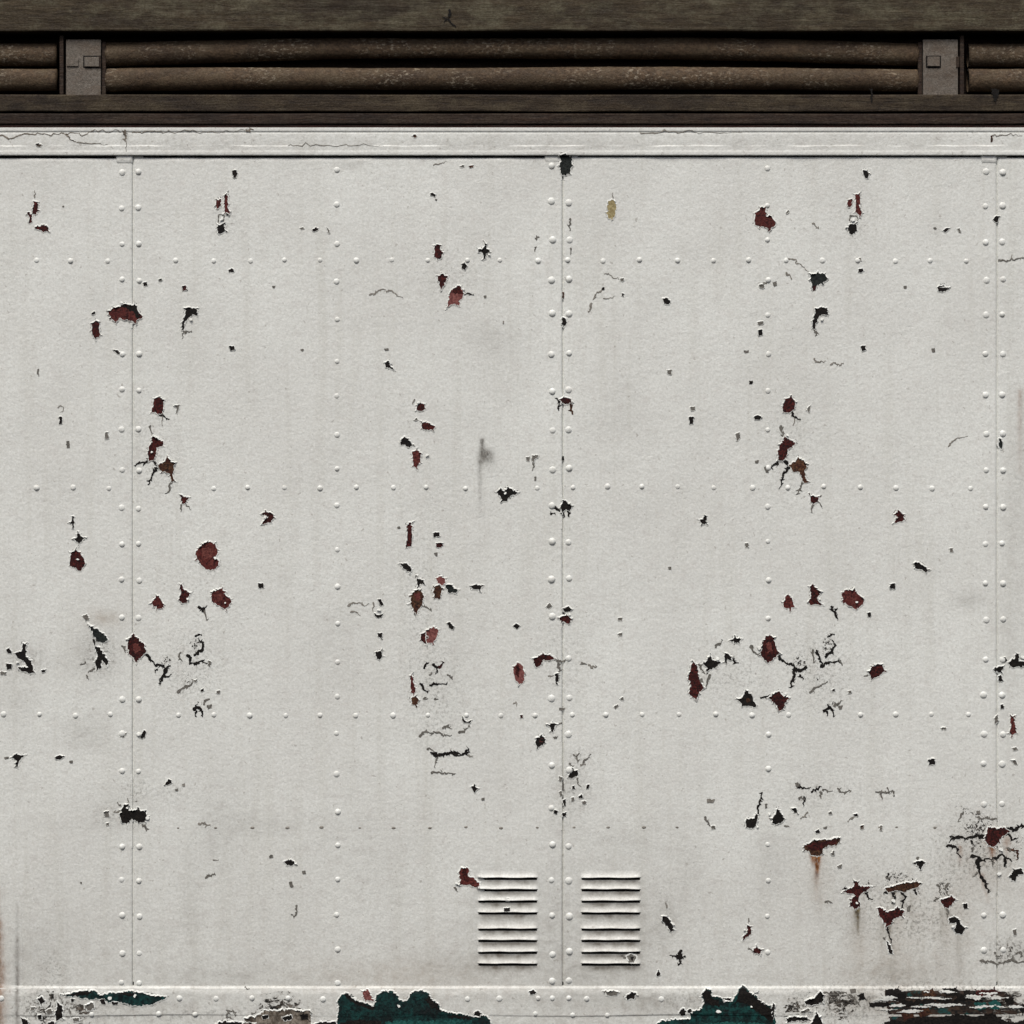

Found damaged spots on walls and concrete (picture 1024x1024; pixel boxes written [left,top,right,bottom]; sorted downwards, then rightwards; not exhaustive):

peeling [86,278,163,355]
peeling [134,392,194,511]
peeling [755,392,825,513]
peeling [146,537,237,614]
peeling [777,579,872,618]
peeling [682,630,785,704]
crack [778,605,851,724]
crack [407,644,472,775]
corrosion [794,788,1024,1024]
peeling [54,988,173,1010]
peeling [210,988,497,1024]
peeling [650,984,890,1024]